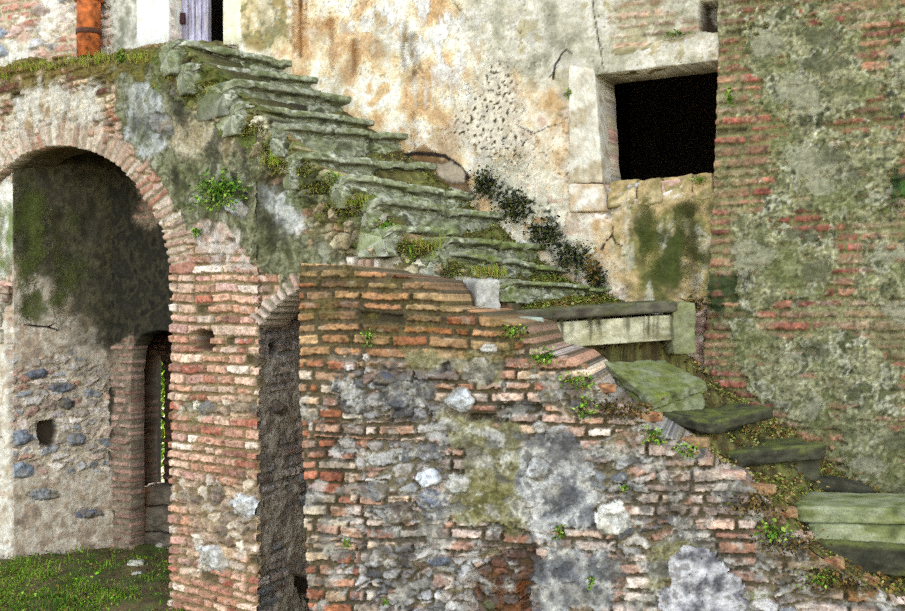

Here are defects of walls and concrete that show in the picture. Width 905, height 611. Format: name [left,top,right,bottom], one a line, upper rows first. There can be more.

leakage [372,0,466,107]
crack [550,49,572,79]
mould [634,203,711,291]
flaking render [729,2,905,494]